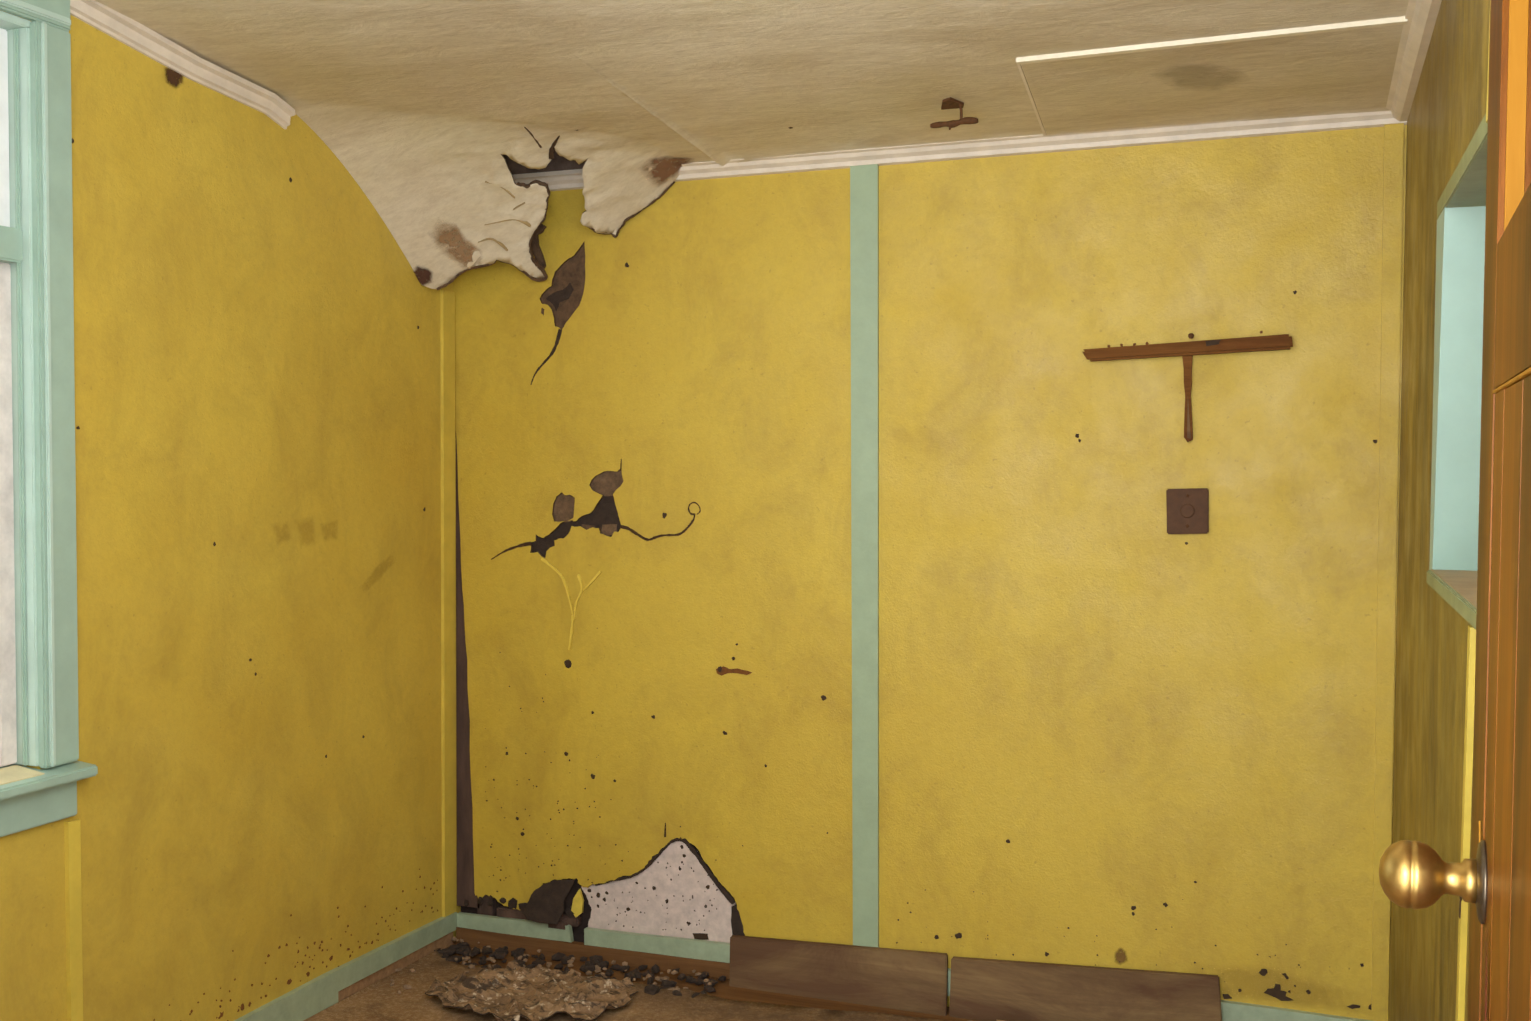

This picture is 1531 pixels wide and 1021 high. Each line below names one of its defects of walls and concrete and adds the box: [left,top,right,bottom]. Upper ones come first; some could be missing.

spalling [502,148,587,175]
flaking render [461,823,745,943]